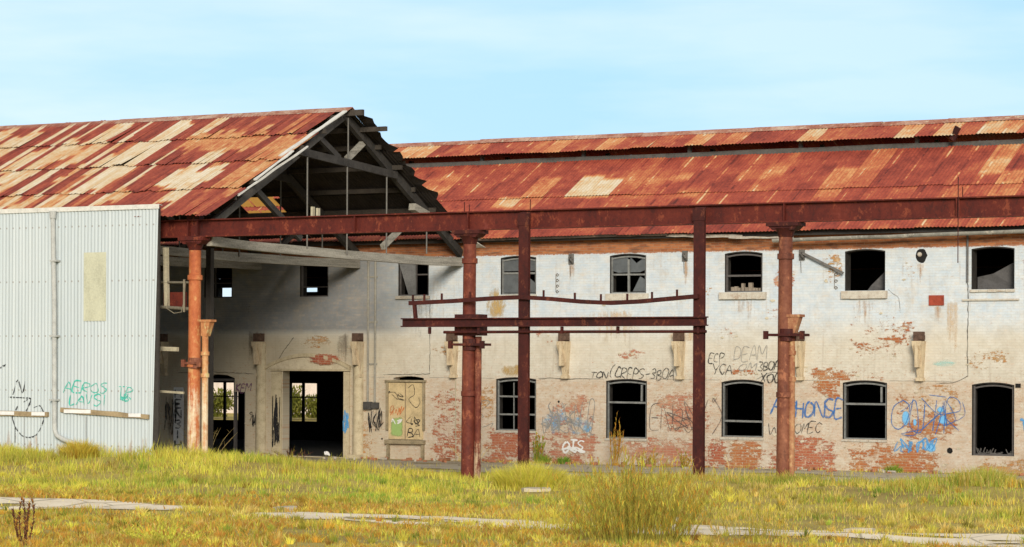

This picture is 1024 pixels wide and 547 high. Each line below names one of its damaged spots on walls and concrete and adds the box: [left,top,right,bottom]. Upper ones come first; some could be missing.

spalling [303,335,340,366]
peeling [848,312,914,357]
peeling [966,349,1009,369]
peeling [430,388,462,461]
peeling [481,386,777,469]
peeling [795,366,964,473]